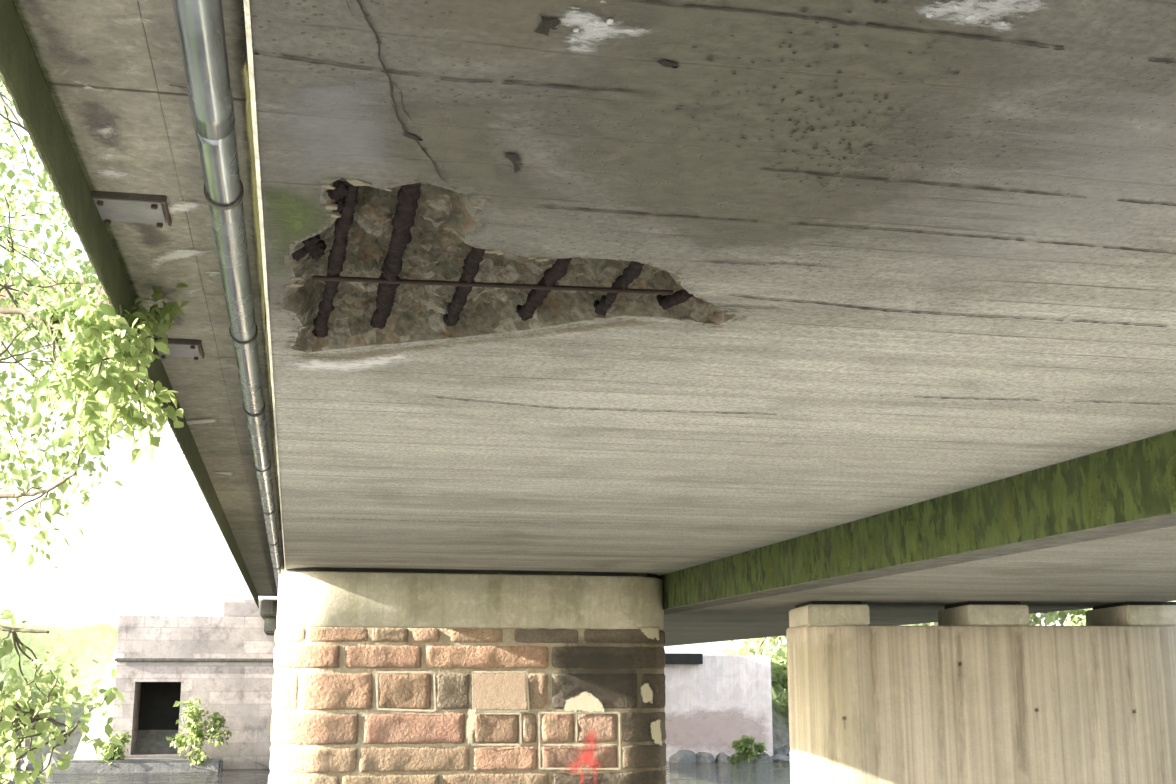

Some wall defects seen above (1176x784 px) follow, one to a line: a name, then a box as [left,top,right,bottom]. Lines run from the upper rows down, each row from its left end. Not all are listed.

crack [346,0,458,189]
water stain [583,0,974,245]
spalling [275,177,738,355]